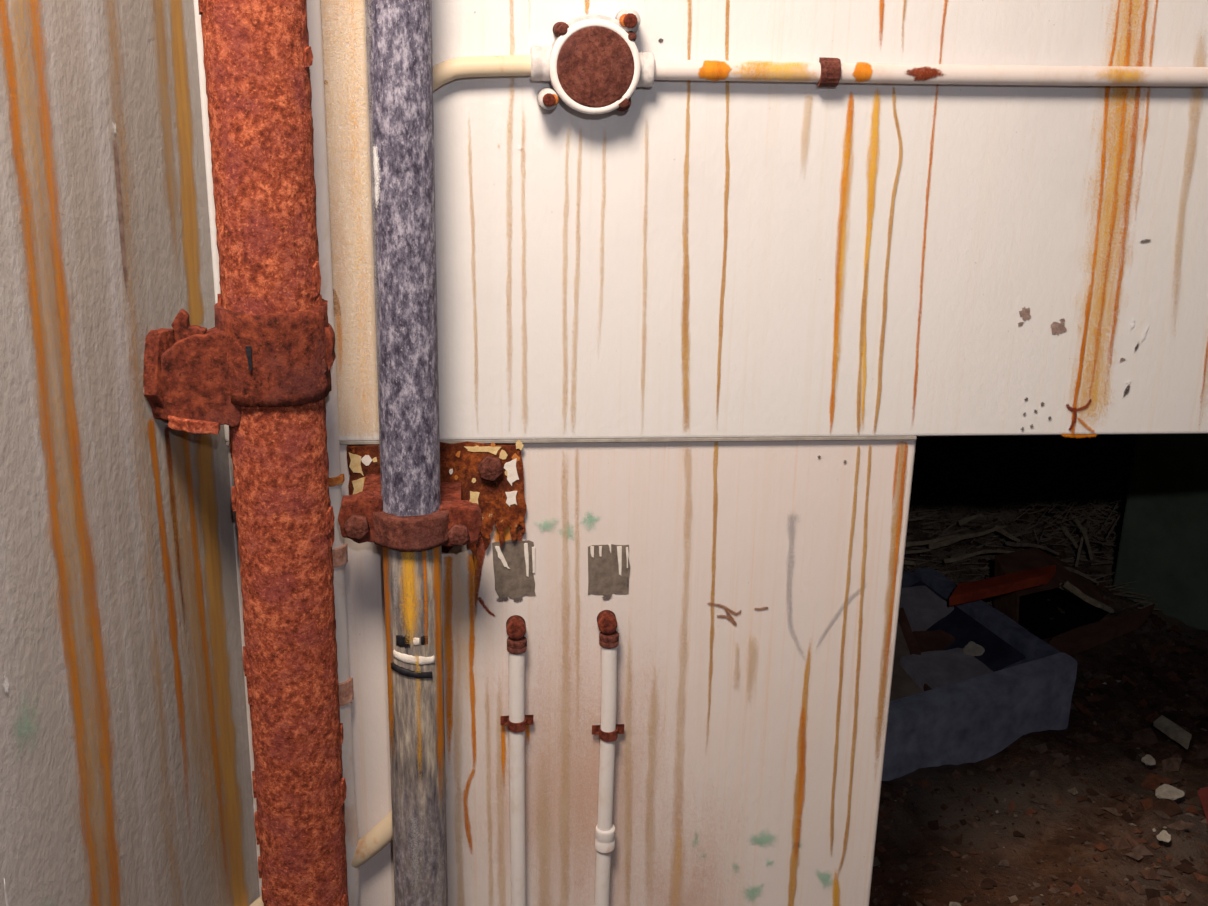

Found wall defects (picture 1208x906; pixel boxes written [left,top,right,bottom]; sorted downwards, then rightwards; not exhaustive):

corrosion [0,0,128,906]
corrosion [799,92,813,178]
corrosion [829,62,903,906]
corrosion [873,84,939,778]
corrosion [938,0,948,64]
corrosion [1062,0,1159,438]
corrosion [1171,86,1206,336]
corrosion [1198,331,1208,430]
corrosion [382,520,526,906]
corrosion [787,638,812,906]